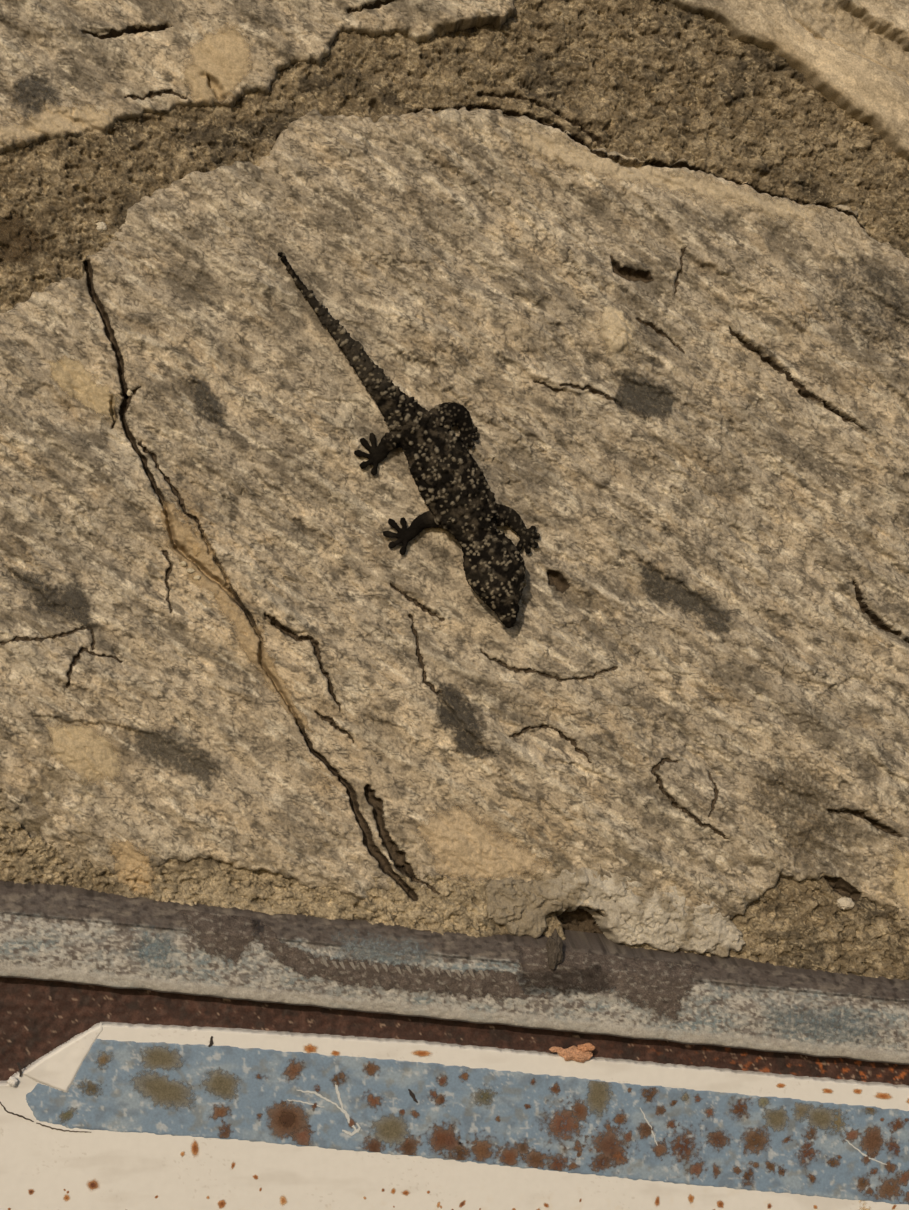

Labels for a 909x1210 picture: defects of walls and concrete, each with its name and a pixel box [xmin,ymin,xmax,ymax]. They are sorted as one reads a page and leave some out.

crack [84,259,445,901]
rust [97,1051,112,1070]
rust [283,1045,316,1081]
rust [363,1061,380,1076]
rust [549,1043,595,1063]
rust [59,1107,77,1123]
rust [77,1080,102,1097]
rust [131,1046,239,1138]
rust [257,1072,346,1146]
rust [363,1073,909,1210]